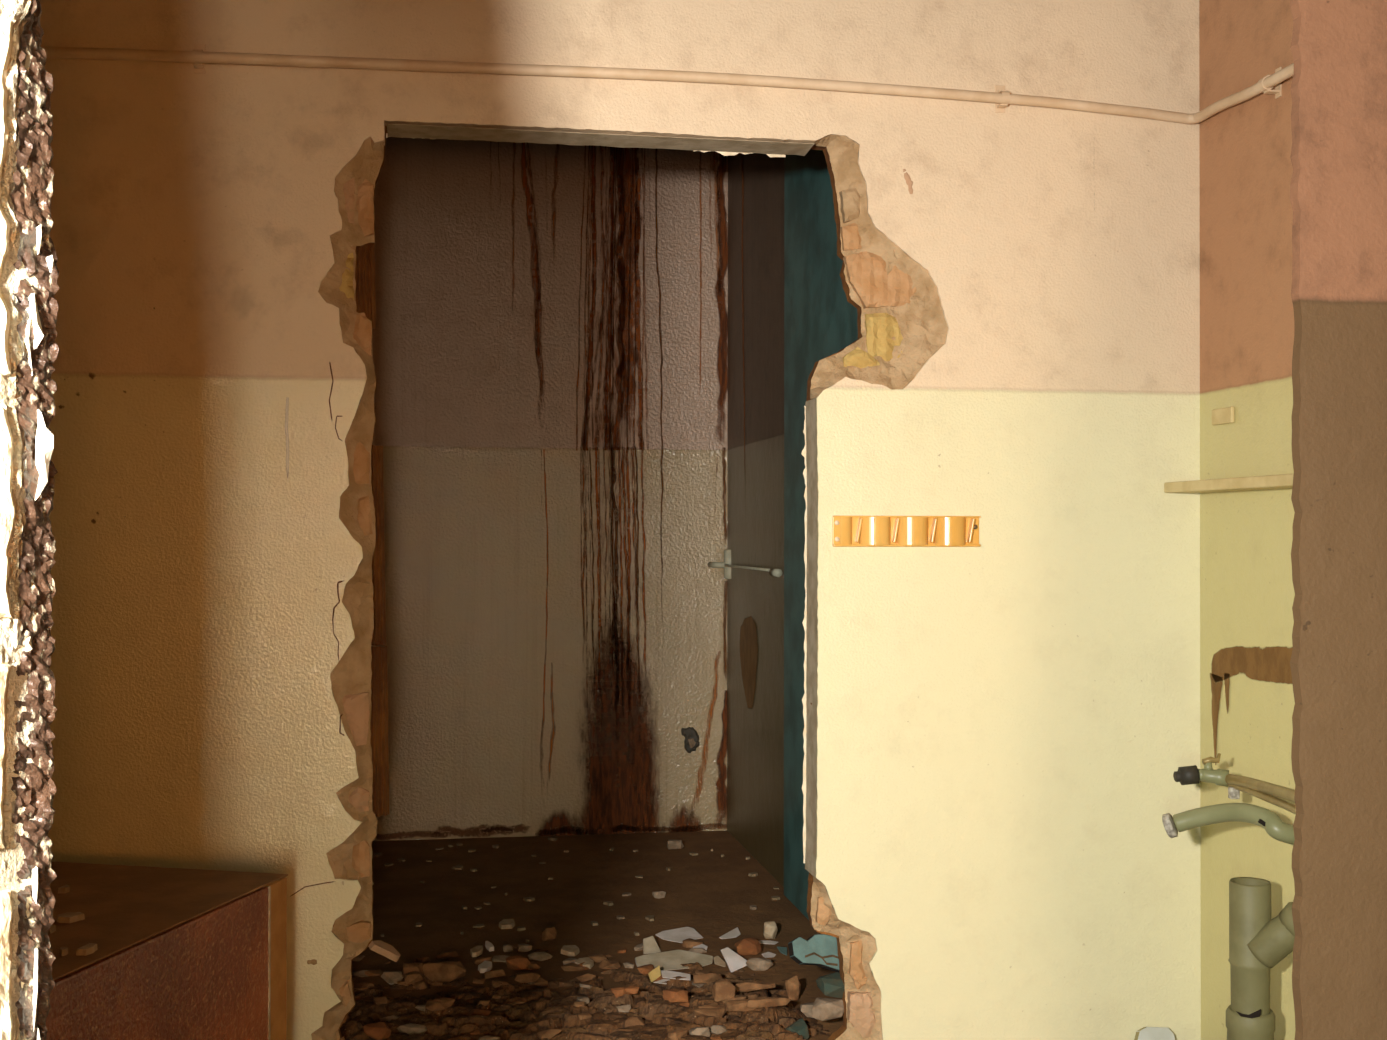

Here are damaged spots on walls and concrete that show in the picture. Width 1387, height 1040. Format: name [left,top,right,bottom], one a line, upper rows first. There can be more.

spalling [0,0,98,1040]
flaking render [307,127,450,1040]
rust [491,142,559,399]
spalling [610,986,639,997]
rust [538,145,727,836]
hole [681,727,700,753]
rust [699,151,745,541]
flaking render [801,135,948,1040]